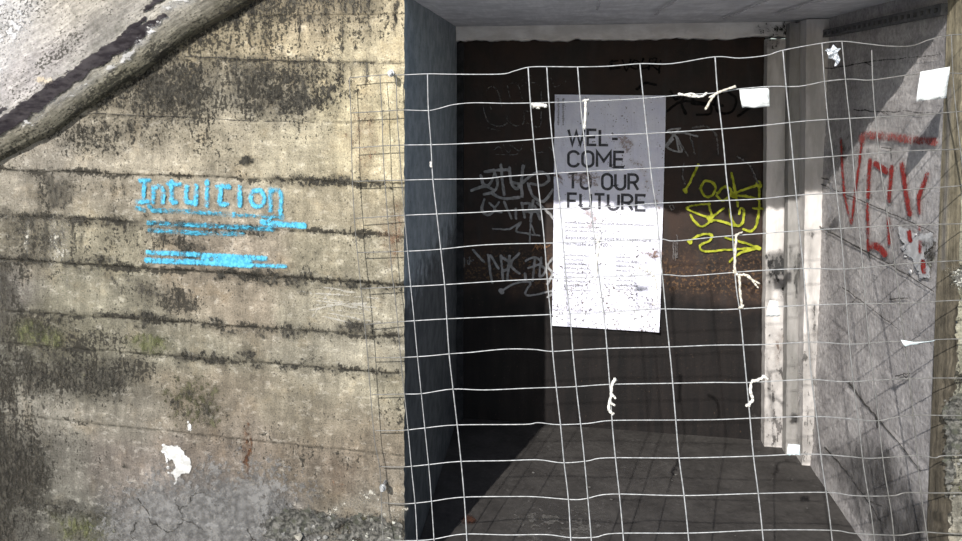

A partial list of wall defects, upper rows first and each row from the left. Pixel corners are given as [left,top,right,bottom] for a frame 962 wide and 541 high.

water stain [56,0,399,154]
water stain [0,168,404,345]
water stain [172,349,343,374]
water stain [0,347,135,541]
crack [130,492,204,539]